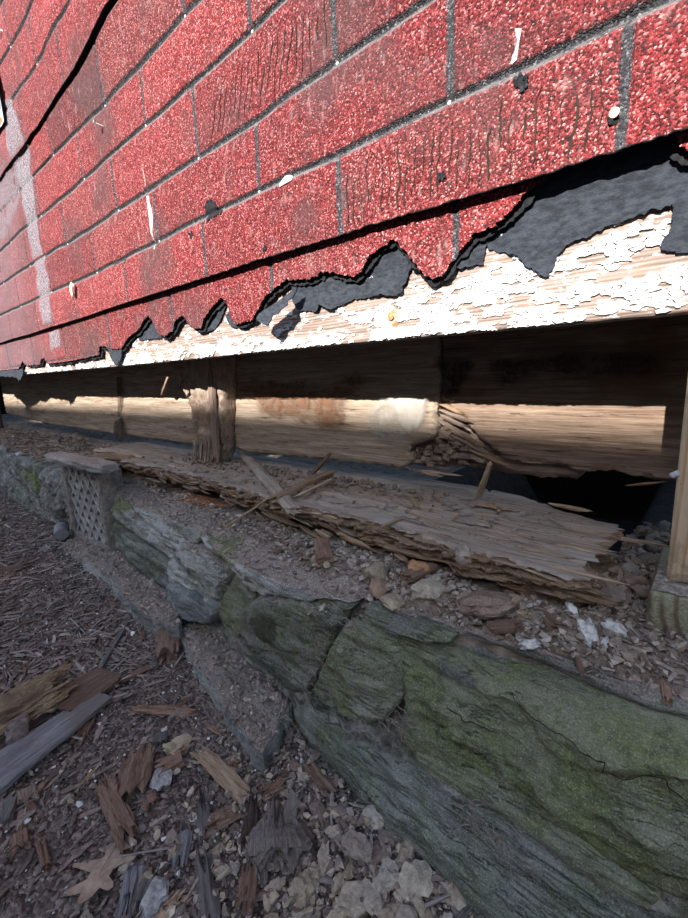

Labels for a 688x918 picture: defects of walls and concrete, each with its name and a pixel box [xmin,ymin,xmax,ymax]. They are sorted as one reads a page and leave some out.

peeling [23,219,688,374]
peeling [413,425,488,465]